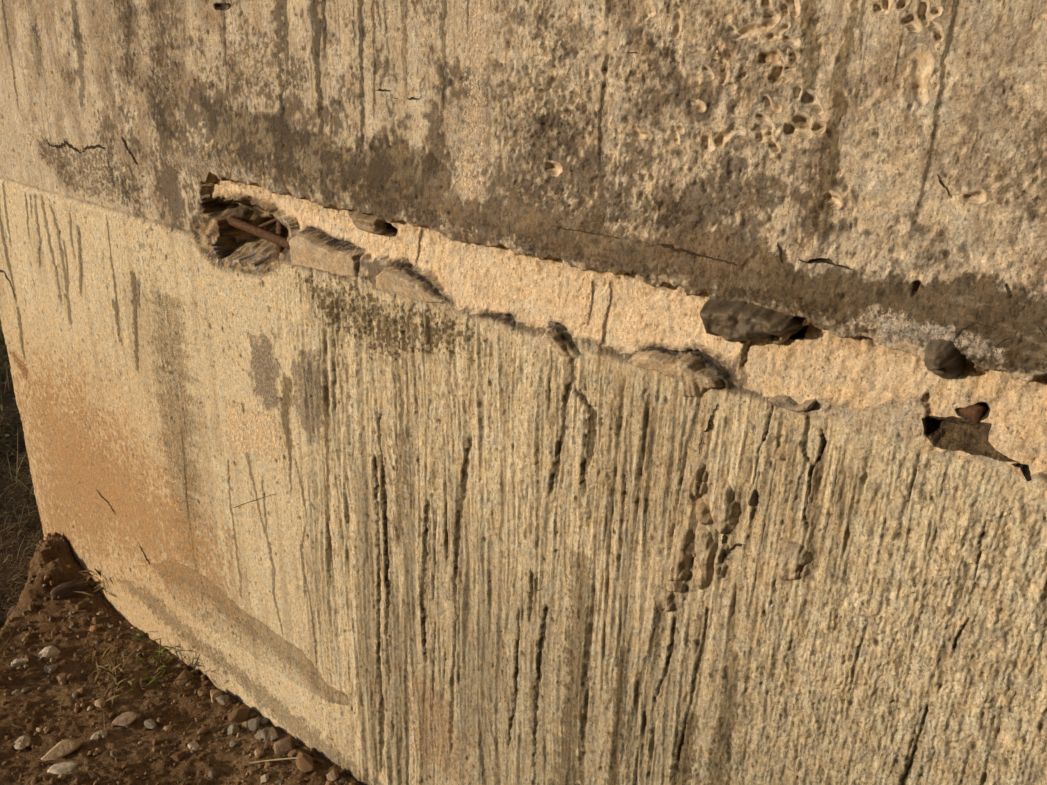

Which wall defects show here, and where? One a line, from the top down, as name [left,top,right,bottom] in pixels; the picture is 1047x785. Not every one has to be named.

water stain [0,182,25,358]
water stain [25,194,83,324]
crack [47,137,137,165]
water stain [106,217,140,370]
water stain [114,0,1047,385]
spalling [192,172,1047,481]
water stain [153,294,348,705]
water stain [391,427,411,542]
water stain [120,580,381,785]